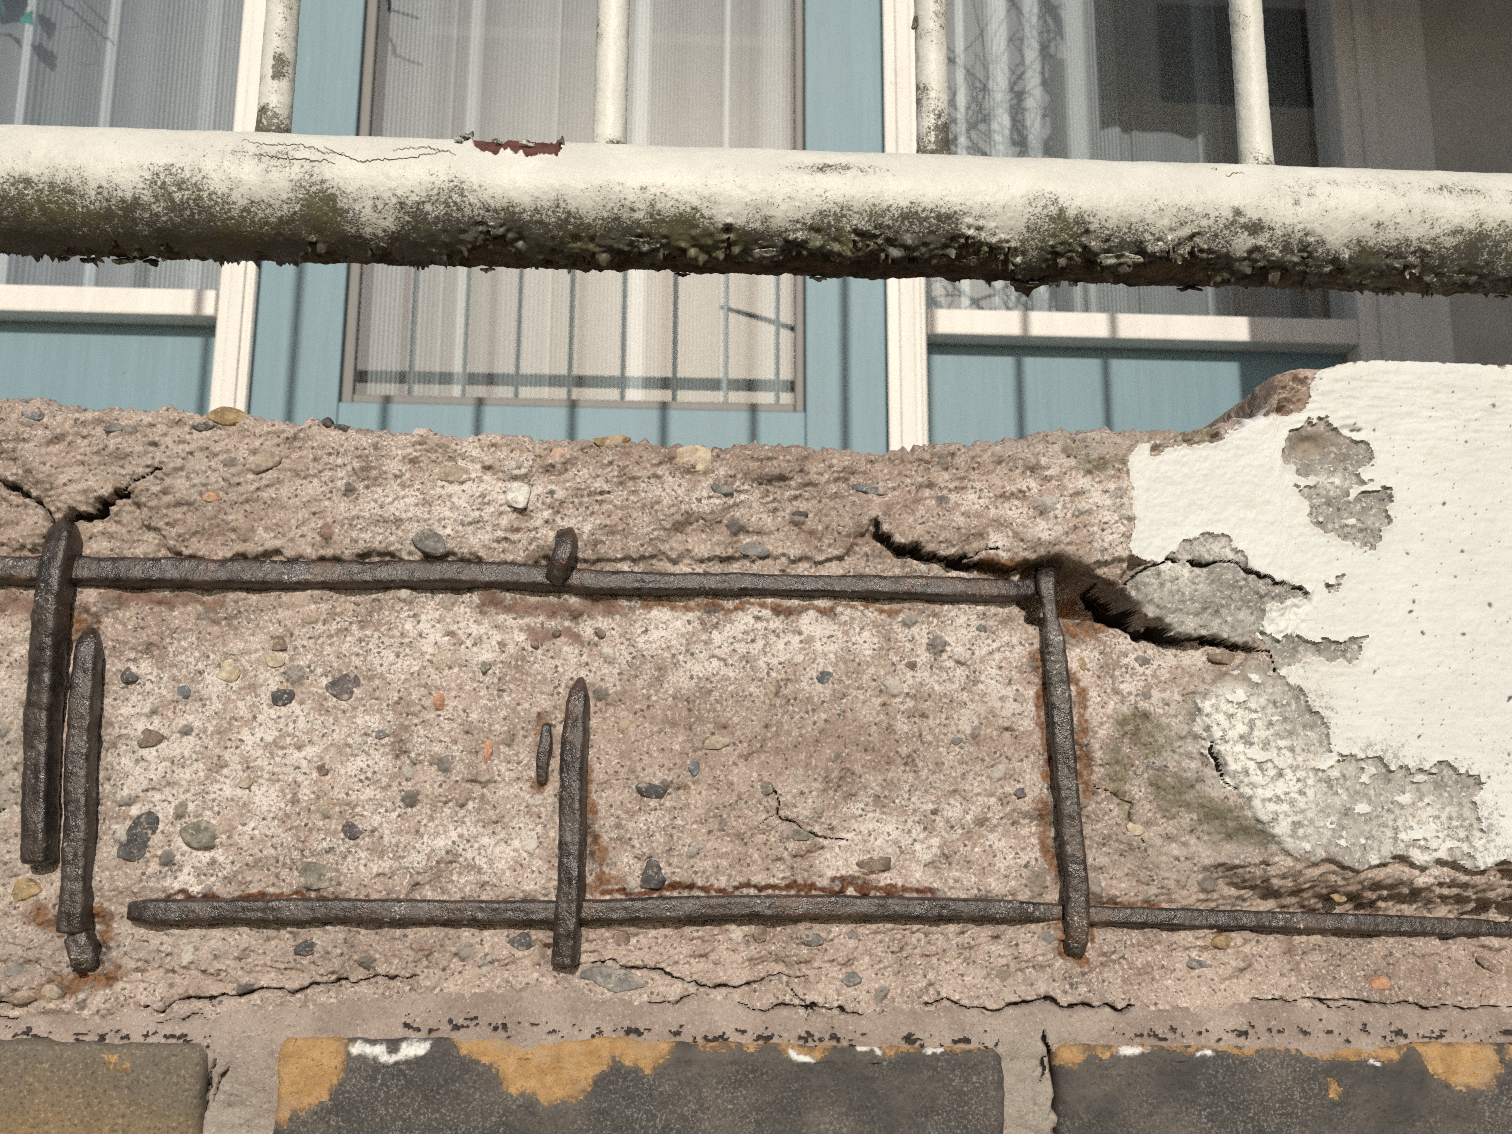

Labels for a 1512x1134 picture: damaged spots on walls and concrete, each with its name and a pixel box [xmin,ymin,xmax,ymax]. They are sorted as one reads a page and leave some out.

crack [0,467,163,523]
crack [872,519,1016,574]
corrosion [978,554,1030,579]
corrosion [479,589,902,643]
spalling [0,361,1512,1022]
corrosion [1029,650,1059,872]
corrosion [585,765,936,897]
corrosion [165,888,338,899]
crack [146,974,419,1023]
crack [577,958,862,1015]
crack [1253,996,1512,1011]
peeling [101,1054,130,1073]